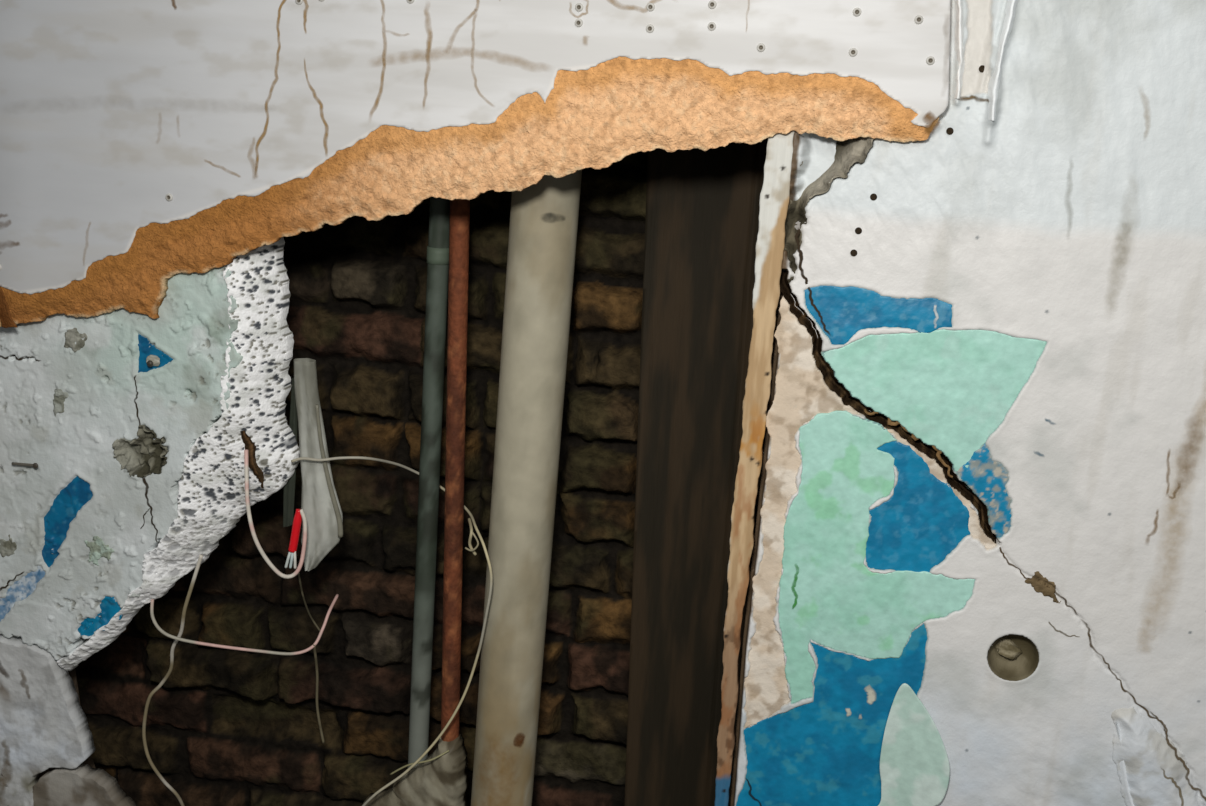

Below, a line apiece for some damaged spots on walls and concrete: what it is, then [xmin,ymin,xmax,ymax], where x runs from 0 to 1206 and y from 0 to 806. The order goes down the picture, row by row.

peeling [0,476,93,621]
spalling [53,389,69,416]
crack [133,376,141,425]
crack [140,478,159,543]
spalling [57,237,300,671]
peeling [736,137,1046,806]
crack [780,229,1206,806]